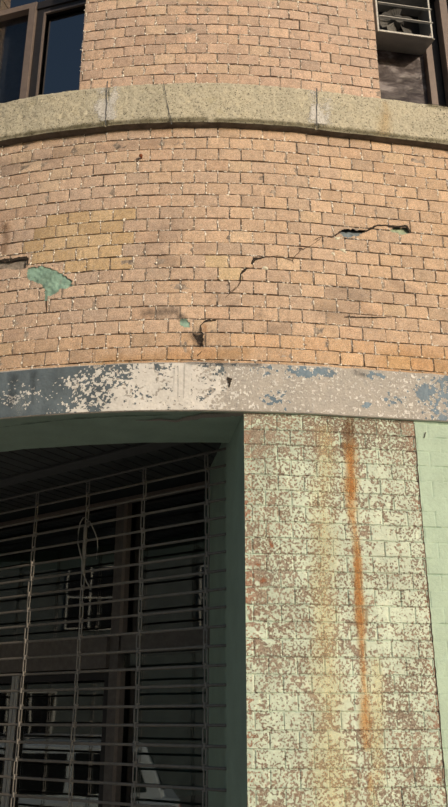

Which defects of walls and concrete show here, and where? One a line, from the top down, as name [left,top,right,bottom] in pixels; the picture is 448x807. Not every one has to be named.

crack [370,224,412,233]
crack [0,256,29,266]
spalling [0,259,74,301]
crack [225,231,341,298]
spalling [179,319,204,347]
crack [197,319,216,356]
peeling [0,363,448,807]
corrosion [346,444,371,748]